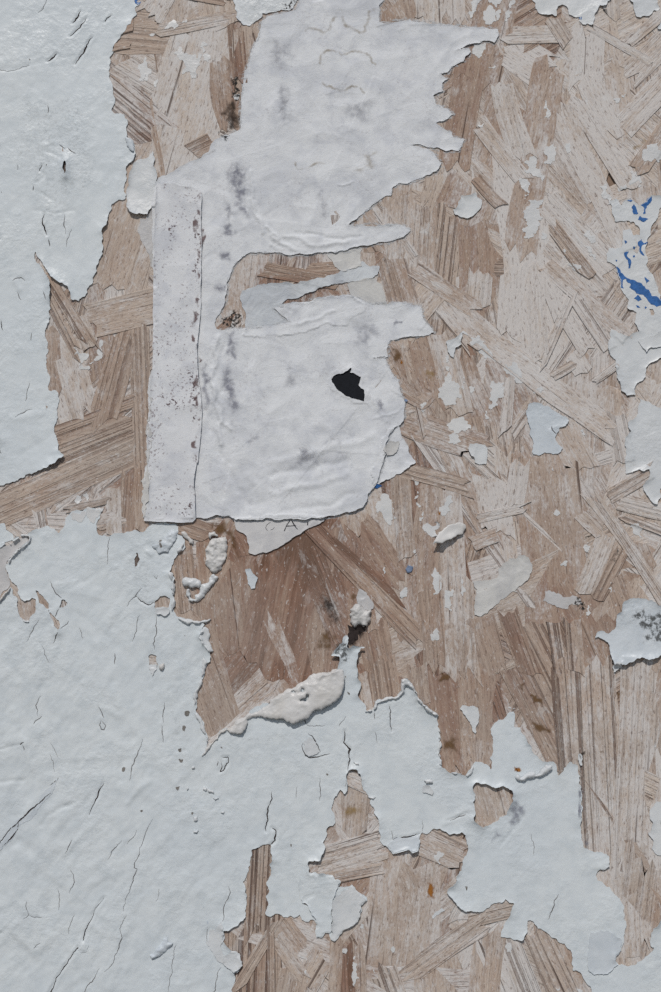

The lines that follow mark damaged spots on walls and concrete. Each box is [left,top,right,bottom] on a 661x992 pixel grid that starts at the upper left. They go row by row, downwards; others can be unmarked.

crack [17,145,76,189]
crack [49,12,110,63]
peeling [0,0,299,629]
peeling [155,0,661,992]